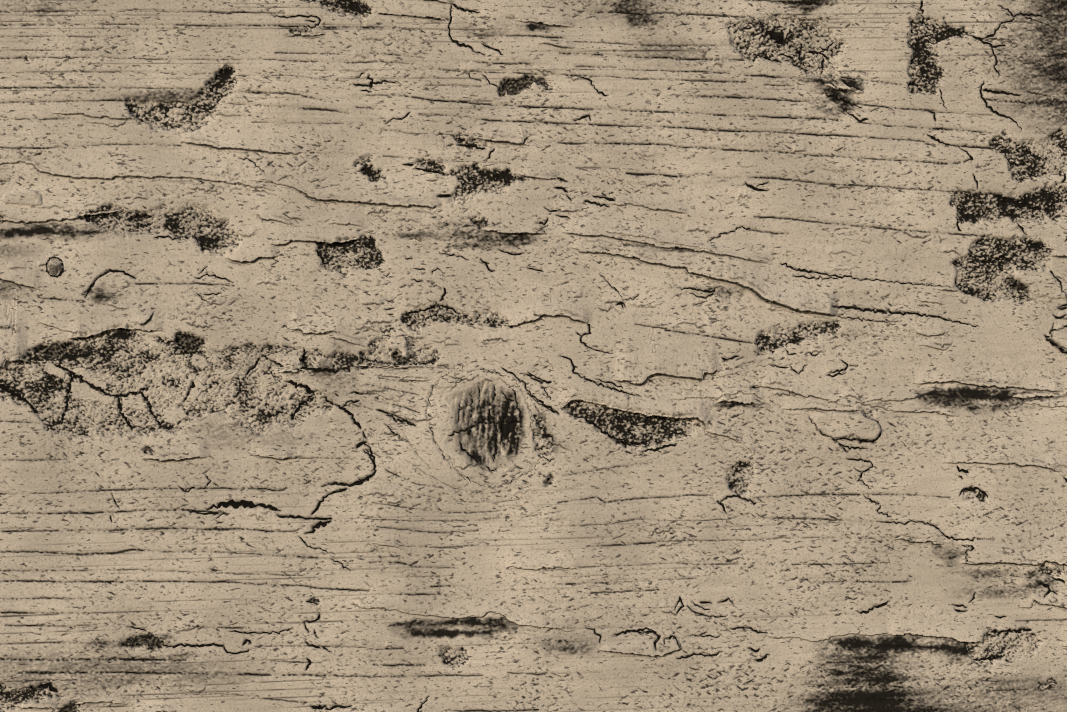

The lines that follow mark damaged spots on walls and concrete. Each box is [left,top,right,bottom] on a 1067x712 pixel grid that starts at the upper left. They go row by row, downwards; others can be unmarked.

spalling [727,15,863,93]
spalling [908,1,974,95]
crack [971,5,1056,130]
spalling [403,136,529,202]
spalling [950,129,1067,231]
spalling [0,199,384,277]
crack [604,278,638,307]
crack [681,287,715,306]
spalling [936,236,1067,304]
spalling [0,288,513,461]
crack [180,250,543,571]
spalling [562,341,960,452]